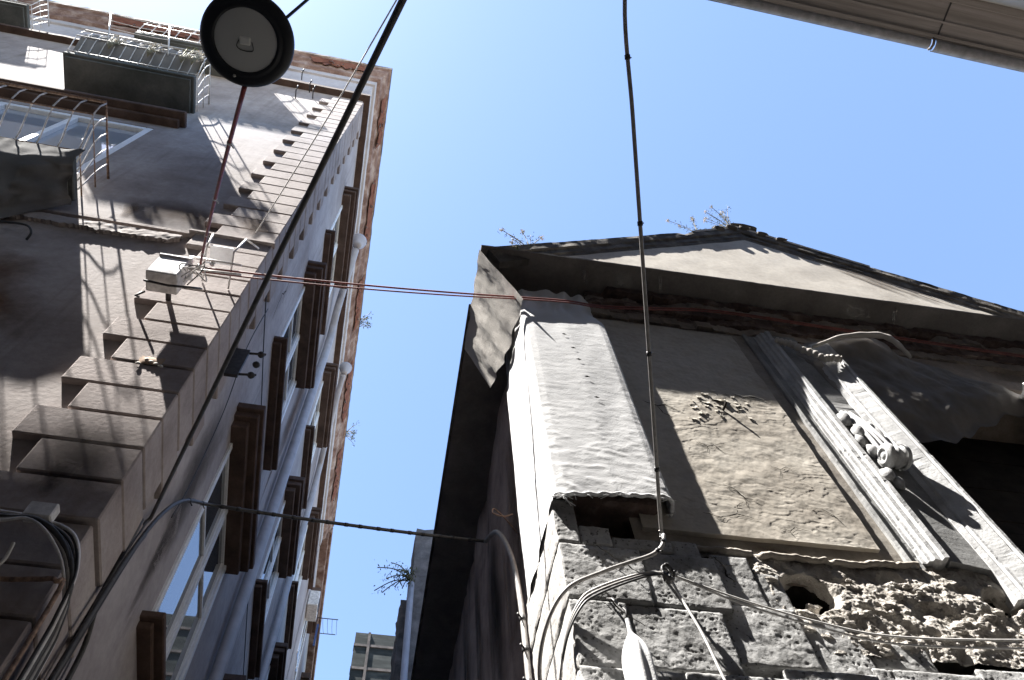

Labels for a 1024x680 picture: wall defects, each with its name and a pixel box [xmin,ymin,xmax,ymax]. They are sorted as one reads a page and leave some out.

spalling [745,552,1024,669]